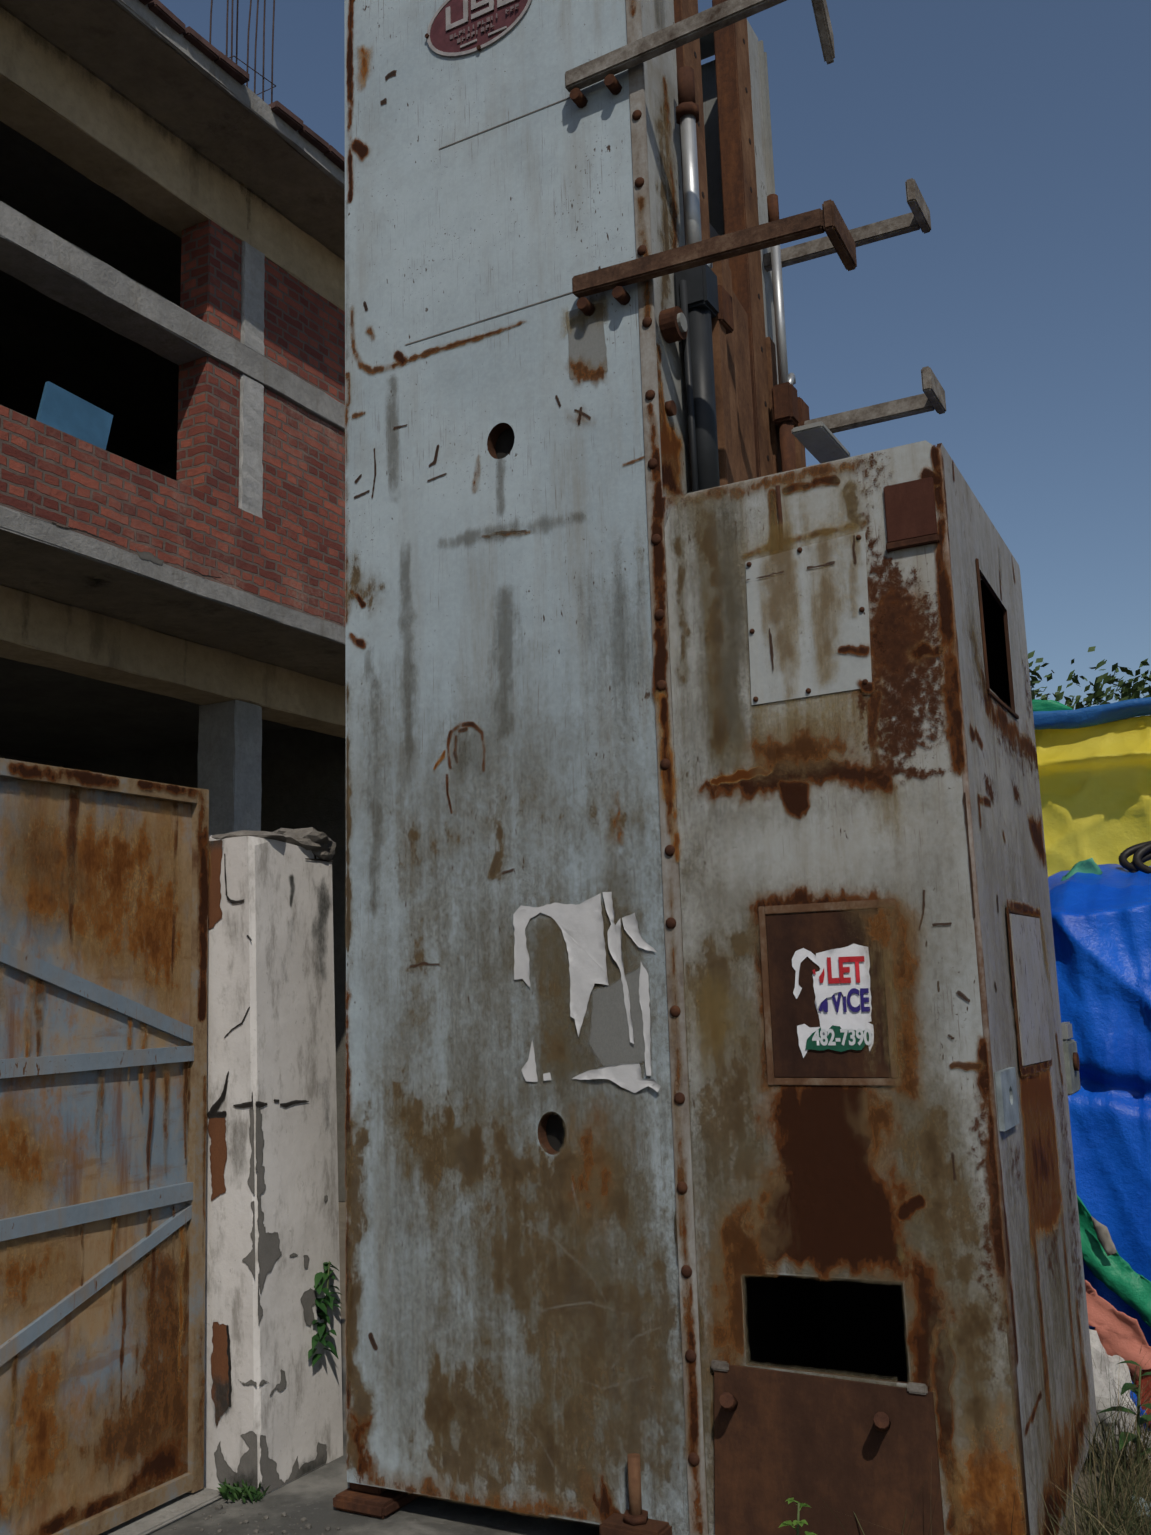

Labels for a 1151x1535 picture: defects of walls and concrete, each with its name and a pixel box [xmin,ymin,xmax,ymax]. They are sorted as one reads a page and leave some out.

rust [346,0,370,203]
rust [345,301,525,426]
rust [647,344,1046,918]
rust [1,762,209,1022]
rust [398,721,514,880]
rust [0,1206,205,1535]
rust [127,1017,207,1235]
flaking render [207,1071,229,1201]
spalling [211,1322,327,1494]
spalling [242,1107,310,1326]
spalling [300,1288,325,1326]
rust [345,885,1089,1535]